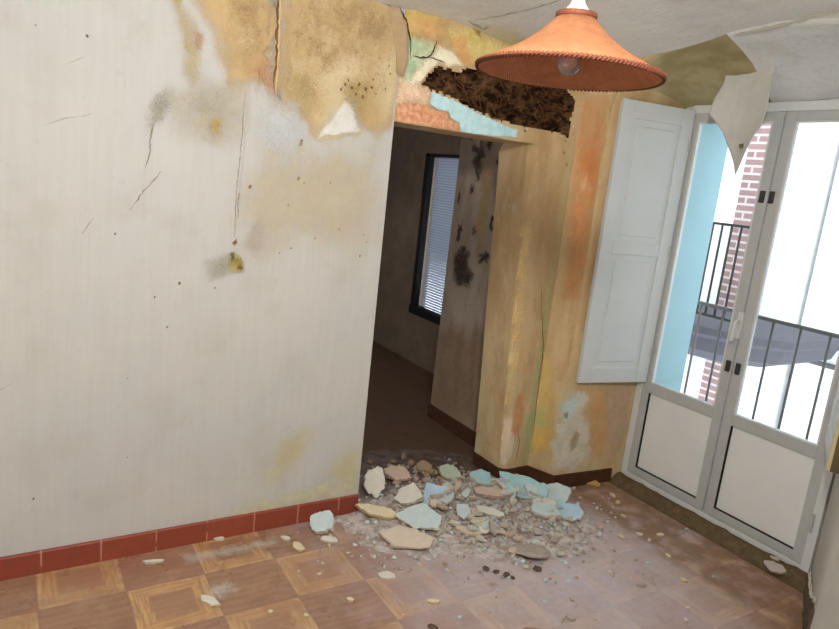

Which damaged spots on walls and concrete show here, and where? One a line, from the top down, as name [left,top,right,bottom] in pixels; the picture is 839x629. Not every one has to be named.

spalling [388,5,580,141]
peeling [317,100,362,142]
peeling [709,66,775,175]
crack [129,171,162,211]
spalling [802,571,816,629]